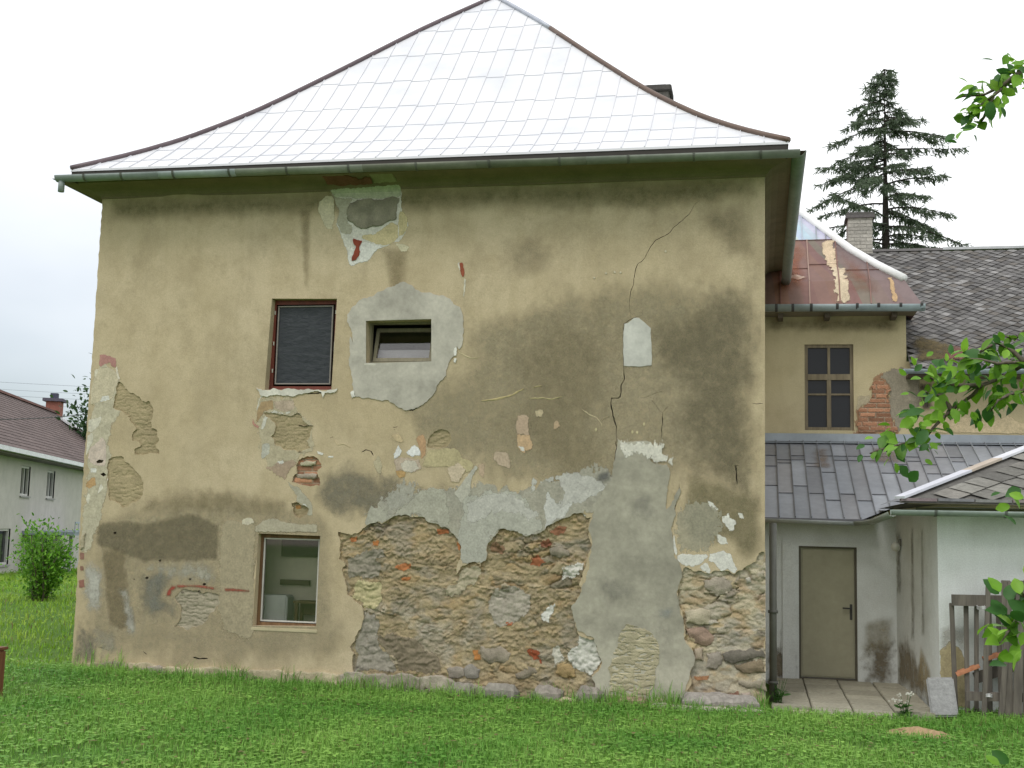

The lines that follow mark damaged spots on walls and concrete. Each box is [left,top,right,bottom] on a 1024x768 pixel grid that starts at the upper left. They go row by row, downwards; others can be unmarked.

flaking render [318,173,409,266]
flaking render [79,354,160,588]
water stain [80,503,326,657]
flaking render [252,388,337,518]
spalling [76,429,613,698]
water stain [322,474,397,513]
water stain [421,292,746,480]
crack [610,206,694,461]
spalling [673,500,767,703]
water stain [689,483,755,551]
spalling [853,367,930,434]
water stain [868,624,930,701]